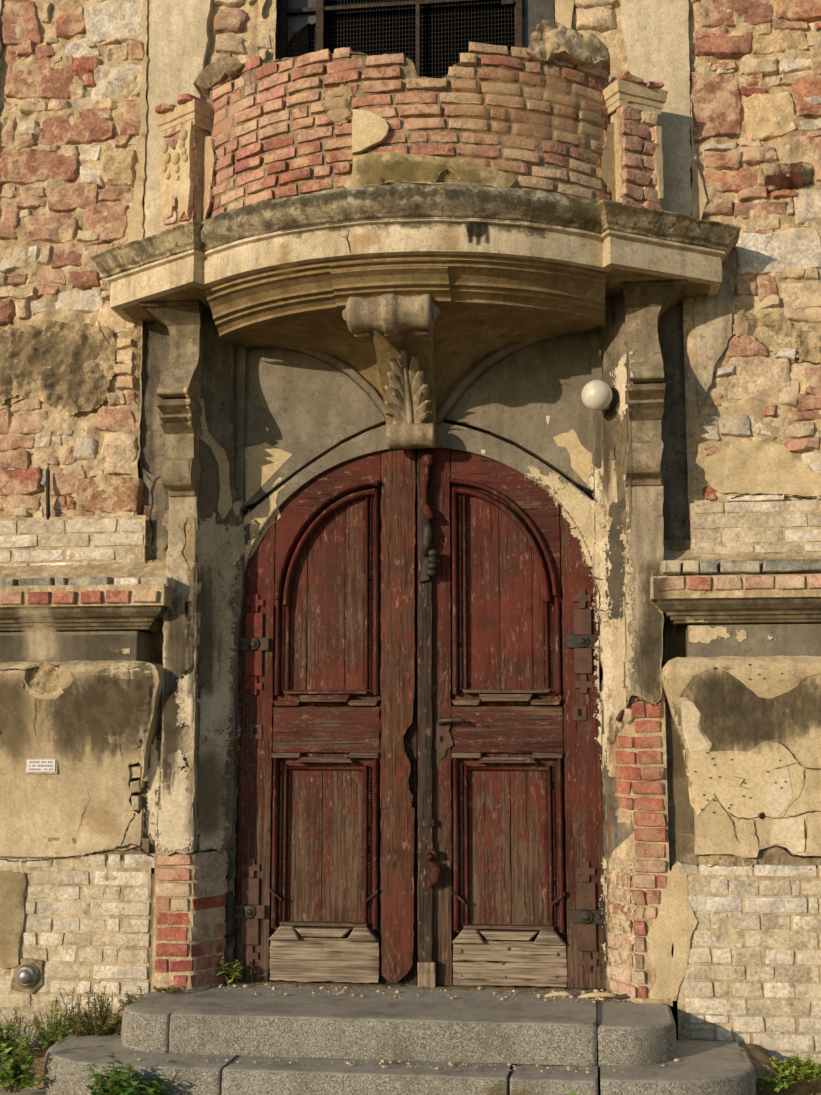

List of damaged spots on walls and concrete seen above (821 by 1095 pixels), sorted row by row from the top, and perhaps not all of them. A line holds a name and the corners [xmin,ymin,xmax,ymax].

leakage [278,213,545,245]
spalling [0,320,117,416]
leakage [139,328,151,386]
spalling [733,305,821,364]
peeling [105,387,292,857]
peeling [524,345,821,867]
leakage [0,599,189,788]
leakage [691,673,821,752]
crack [771,740,821,783]
crack [0,843,154,863]
crack [713,777,821,851]
spalling [598,855,638,982]